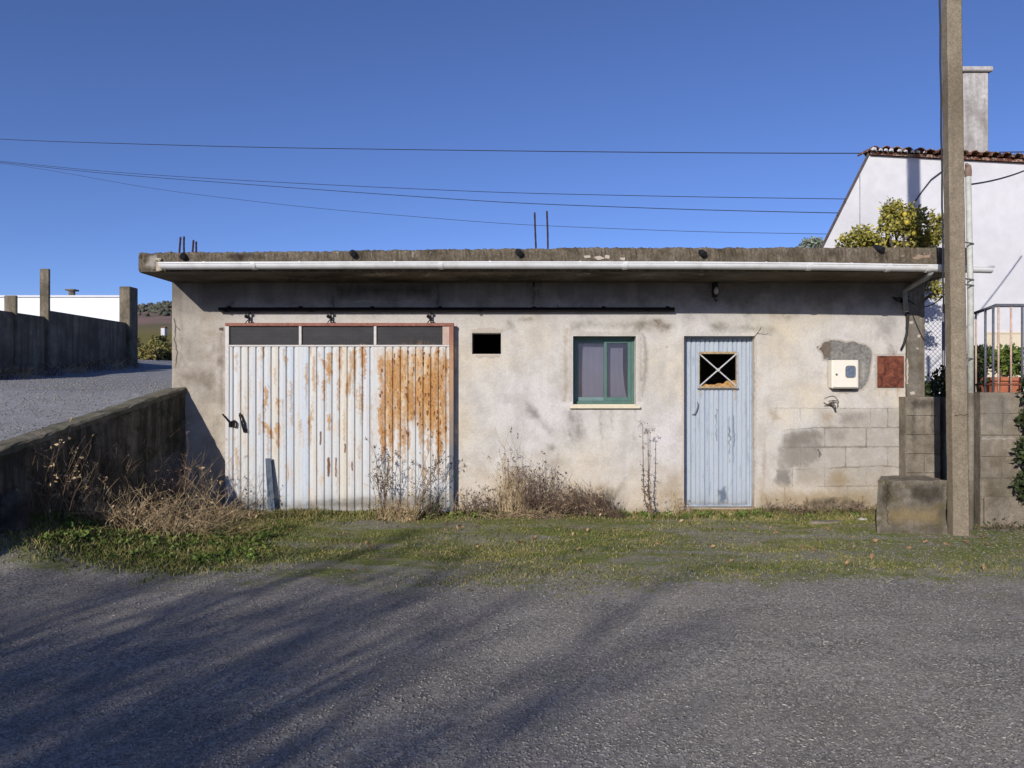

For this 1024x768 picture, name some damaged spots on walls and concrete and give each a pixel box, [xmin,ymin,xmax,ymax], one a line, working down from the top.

corrosion [323,344,447,461]
flaking render [817,339,873,394]